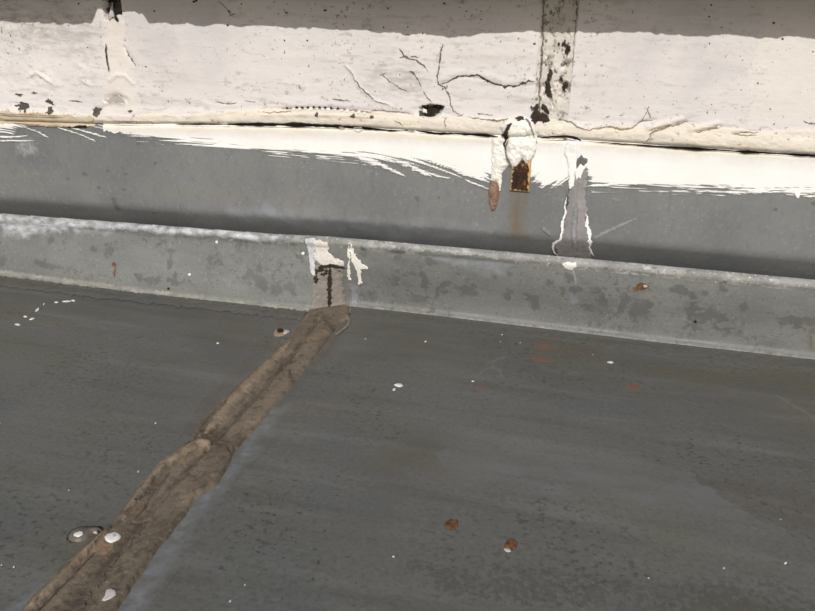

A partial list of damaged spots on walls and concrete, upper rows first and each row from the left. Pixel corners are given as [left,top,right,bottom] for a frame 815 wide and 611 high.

crack [177,0,815,165]
leakage [541,0,773,128]
leakage [0,194,815,611]